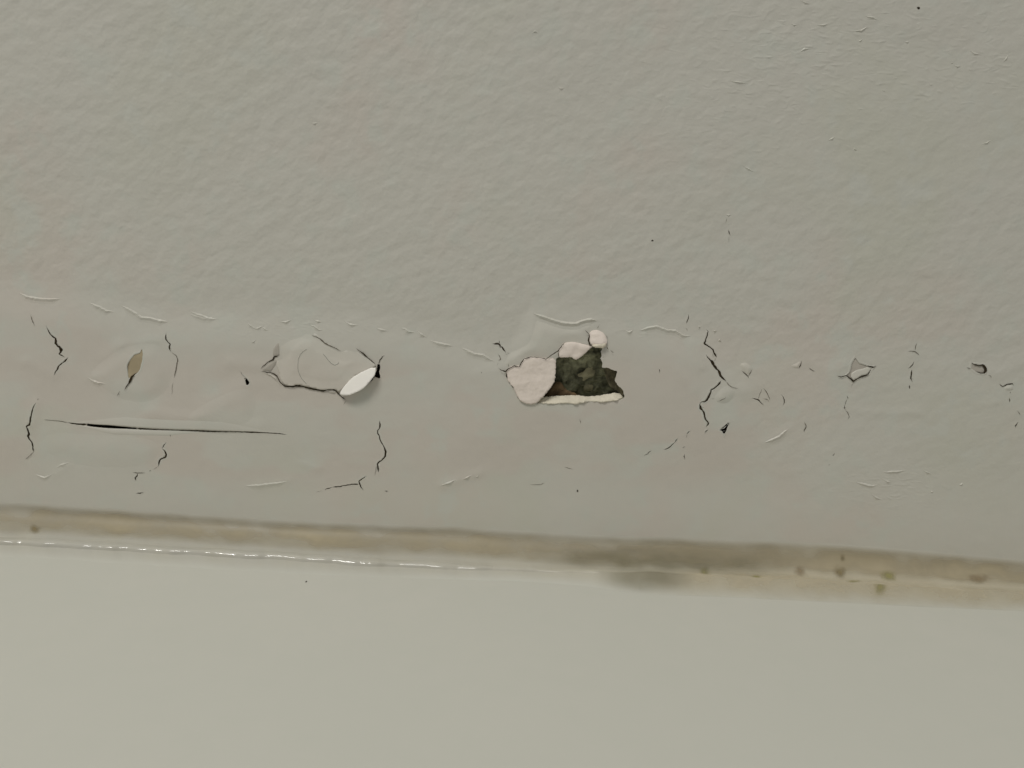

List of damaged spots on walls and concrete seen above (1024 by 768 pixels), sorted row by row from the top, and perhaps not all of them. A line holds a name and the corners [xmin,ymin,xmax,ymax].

crack [31,317,68,375]
peeling [118,348,144,394]
peeling [506,330,607,405]
crack [644,315,787,459]
peeling [838,356,876,383]
crack [24,399,281,495]
crack [318,420,389,493]
leakage [0,510,1024,589]